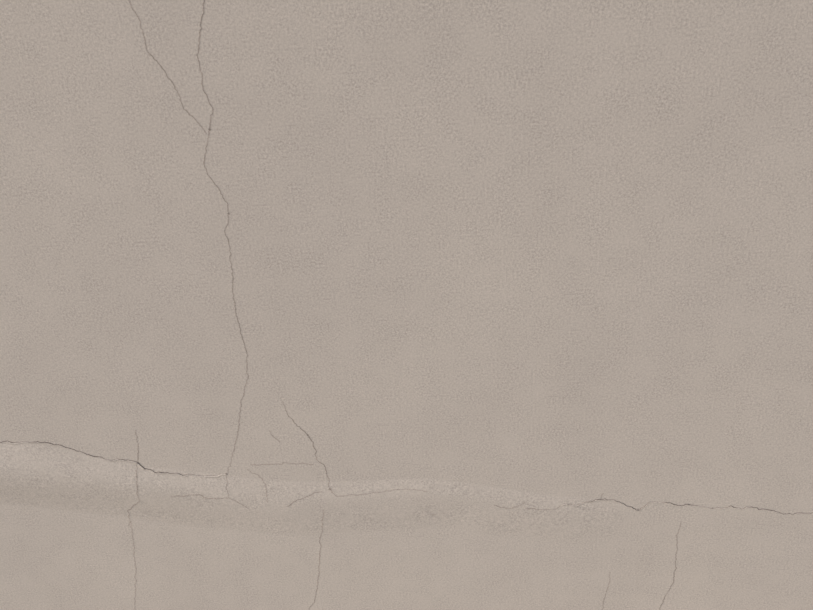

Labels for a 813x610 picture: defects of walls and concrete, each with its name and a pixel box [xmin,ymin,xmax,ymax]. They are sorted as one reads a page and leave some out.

crack [0,441,227,478]
crack [561,499,813,516]